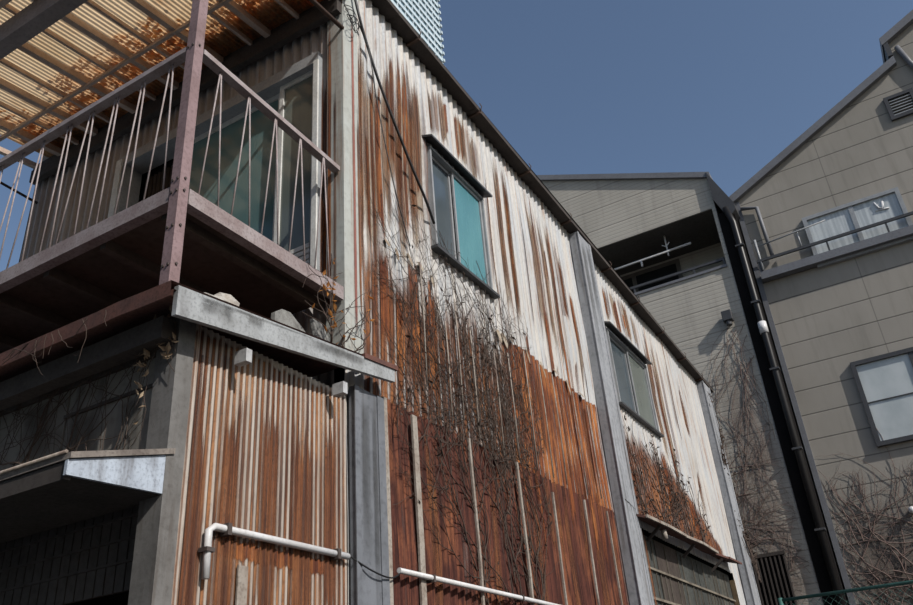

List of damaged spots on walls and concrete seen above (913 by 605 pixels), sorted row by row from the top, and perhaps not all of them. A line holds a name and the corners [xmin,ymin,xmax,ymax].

corrosion [172,330,345,605]
corrosion [351,29,629,605]
corrosion [602,290,724,562]